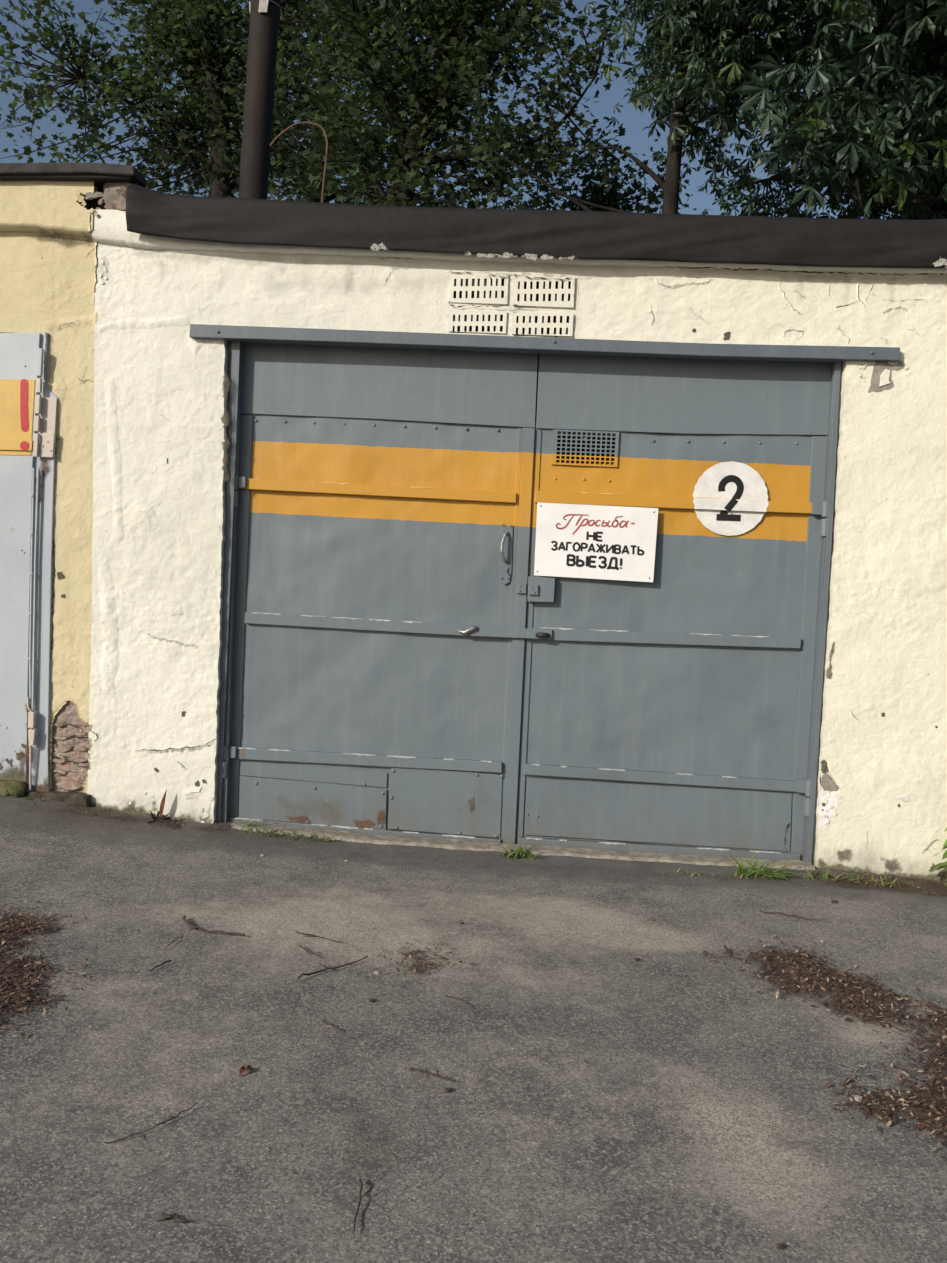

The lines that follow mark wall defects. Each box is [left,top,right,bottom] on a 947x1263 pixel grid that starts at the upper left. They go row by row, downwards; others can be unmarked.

crack [649,265,944,378]
peeling [858,361,908,393]
spalling [34,698,236,837]
corrosion [354,811,385,828]